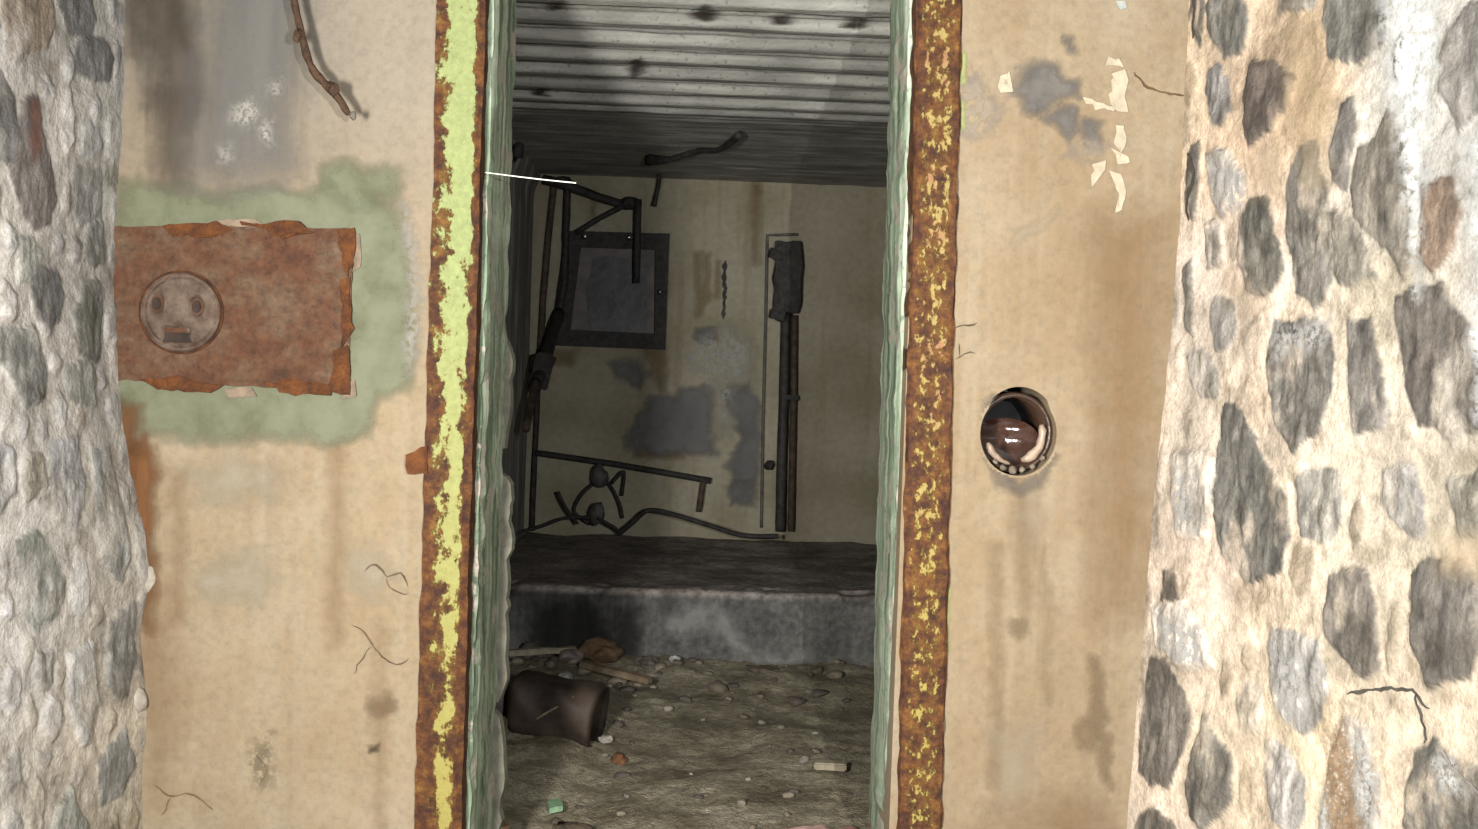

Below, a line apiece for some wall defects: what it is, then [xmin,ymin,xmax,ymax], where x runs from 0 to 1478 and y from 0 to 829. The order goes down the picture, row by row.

spalling [960,52,1130,213]
crack [1134,72,1184,96]
corrosion [163,220,314,239]
peeling [118,161,414,446]
corrosion [262,228,356,396]
corrosion [140,376,224,393]
crack [1347,686,1478,794]